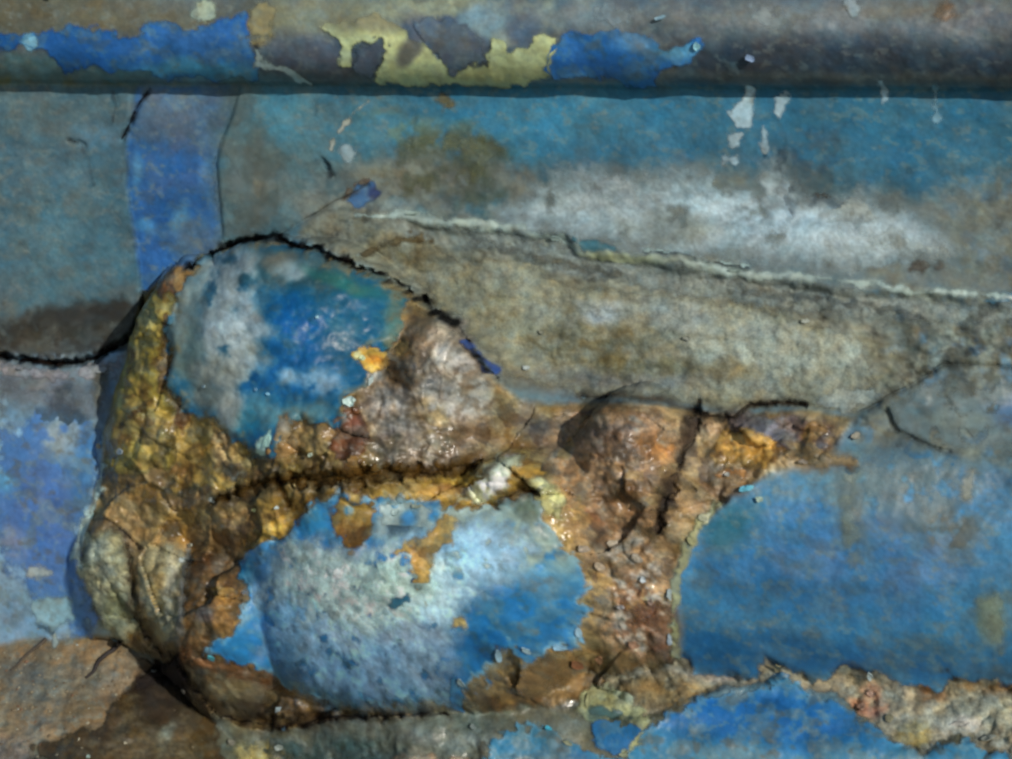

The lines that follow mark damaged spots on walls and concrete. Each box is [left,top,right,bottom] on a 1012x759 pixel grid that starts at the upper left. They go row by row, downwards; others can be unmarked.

peeling [322,4,704,89]
crack [0,338,130,366]
rust [96,266,256,503]
rust [176,543,282,692]
crack [184,233,492,372]
peeling [203,488,594,712]
rust [250,406,677,658]
flaking render [163,178,1012,460]
crack [615,392,776,535]
peeling [478,502,1012,759]
rust [711,411,858,503]
water stain [30,660,236,759]